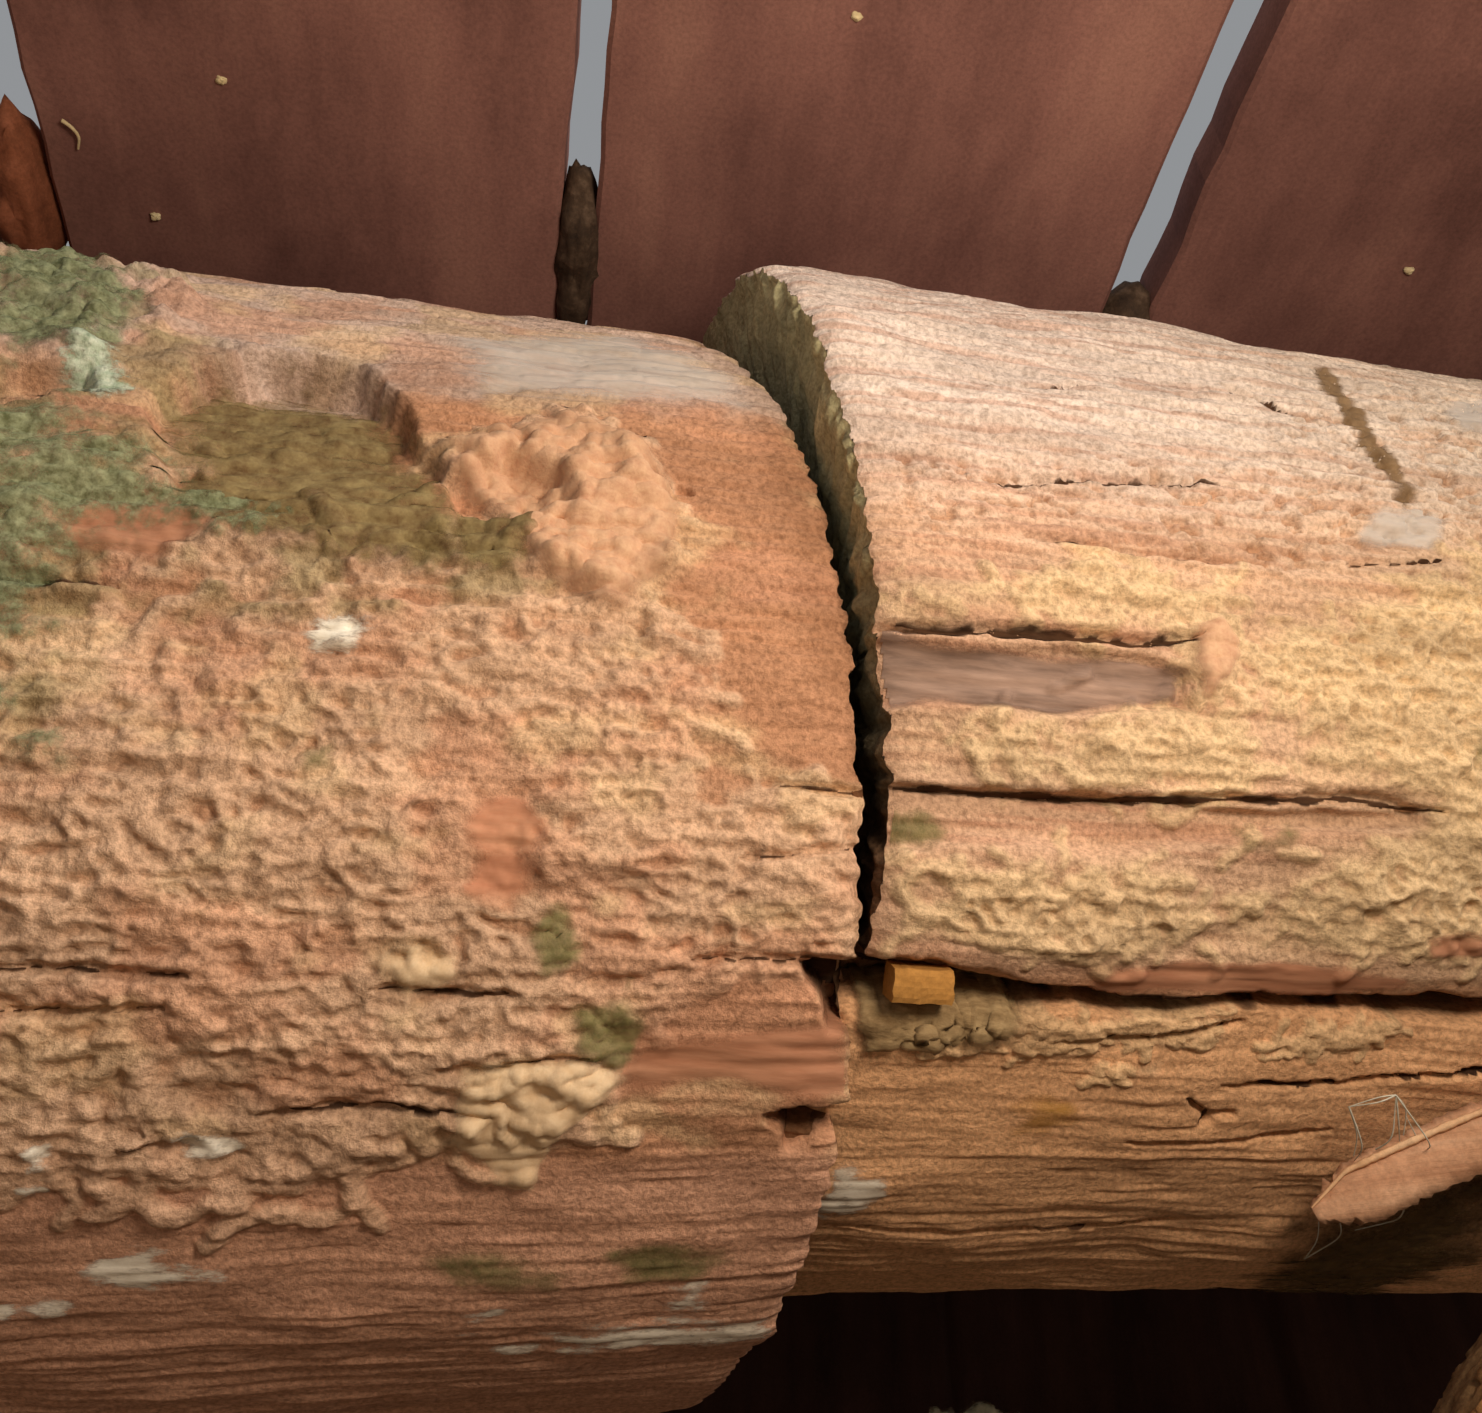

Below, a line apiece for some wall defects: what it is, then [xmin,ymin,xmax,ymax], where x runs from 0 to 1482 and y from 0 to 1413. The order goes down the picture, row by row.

peeling [879,631,1182,712]
crack [780,785,853,795]
crack [892,785,1443,812]
crack [760,852,794,860]
crack [0,964,100,972]
crack [118,971,179,1013]
crack [0,1005,60,1013]
crack [290,1101,463,1116]